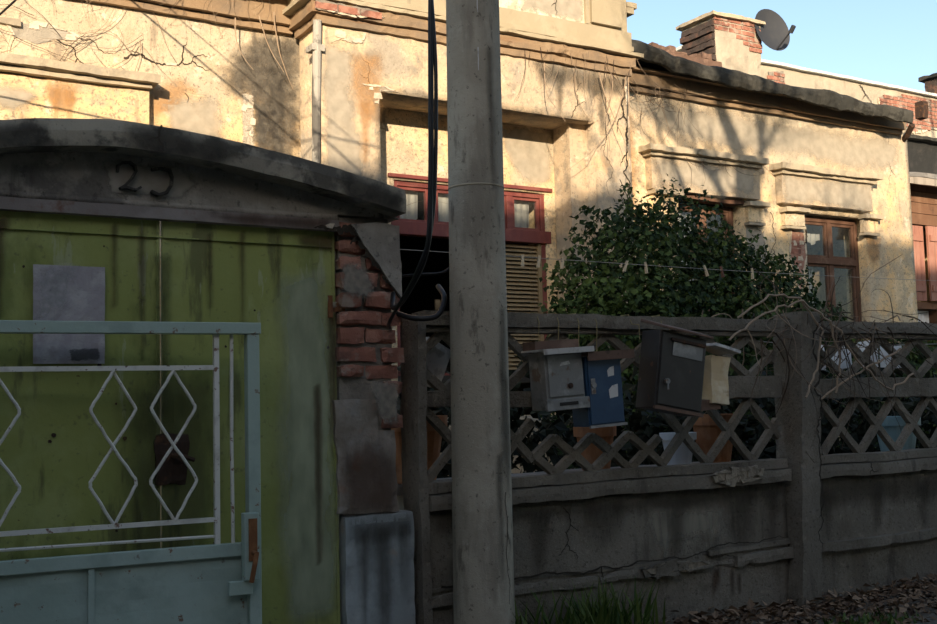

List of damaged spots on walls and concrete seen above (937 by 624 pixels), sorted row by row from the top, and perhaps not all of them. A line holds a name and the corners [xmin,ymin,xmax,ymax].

crack [56,39,210,71]
flaking render [767,71,785,84]
flaking render [878,94,937,134]
peeling [350,222,402,298]
flaking render [789,229,807,289]
spalling [711,465,764,487]
crack [505,492,787,604]